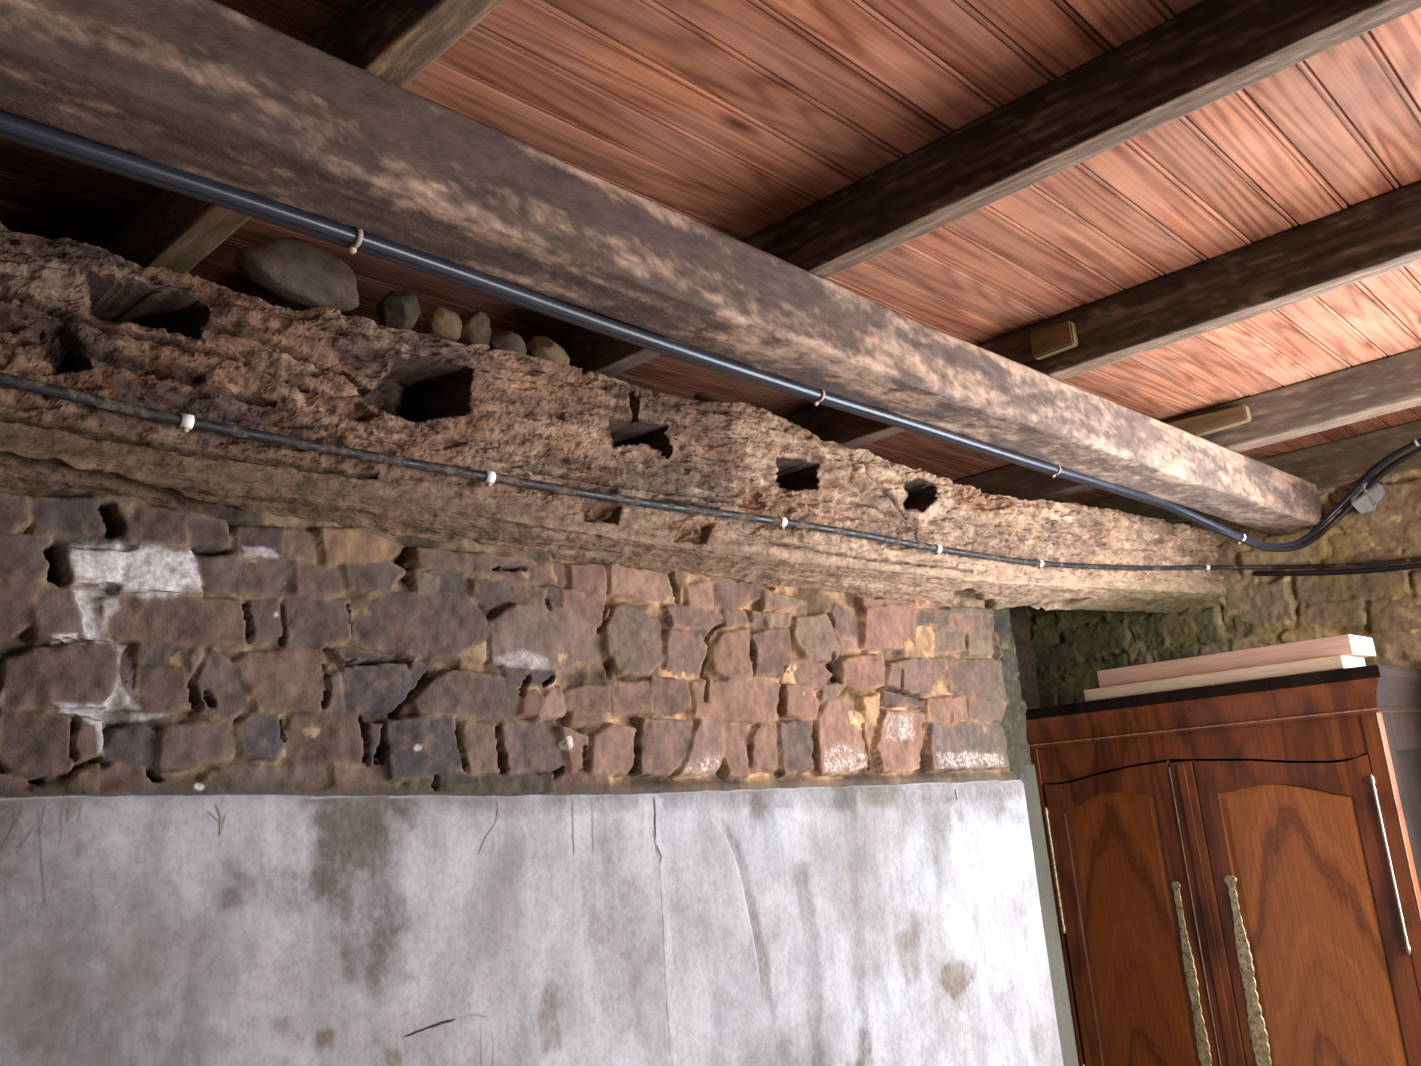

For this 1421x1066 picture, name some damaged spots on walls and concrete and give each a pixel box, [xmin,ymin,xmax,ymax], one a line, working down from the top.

damp [58,543,202,711]
damp [824,745,866,772]
damp [944,752,1004,767]